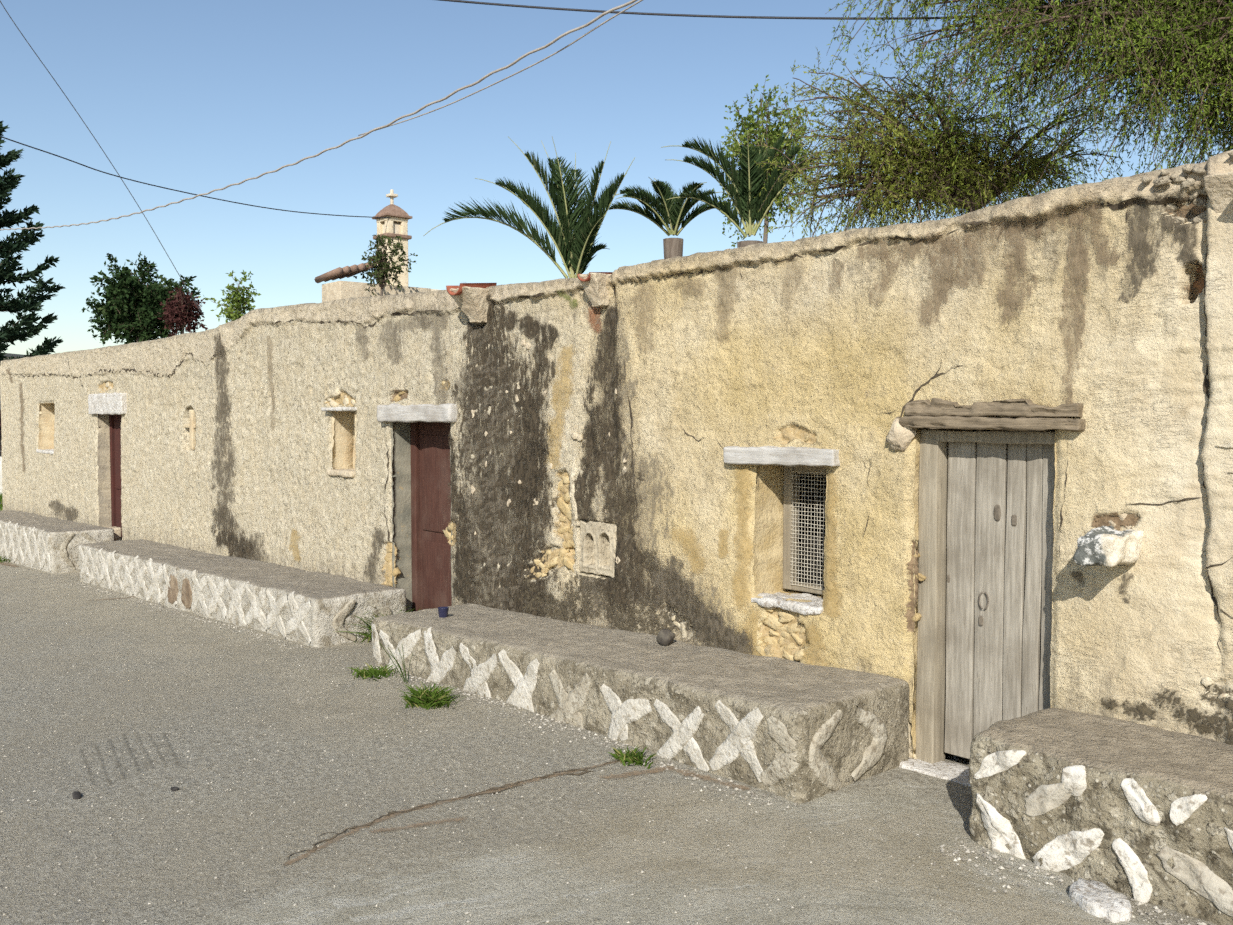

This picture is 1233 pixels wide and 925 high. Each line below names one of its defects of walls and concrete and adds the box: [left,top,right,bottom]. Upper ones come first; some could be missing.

water stain [856,190,1197,404]
crack [1202,237,1210,425]
water stain [211,335,266,561]
spalling [528,463,575,579]
water stain [448,296,766,656]
spalling [756,598,807,662]
water stain [823,473,840,617]
crack [1205,558,1232,664]
water stain [1101,684,1233,745]